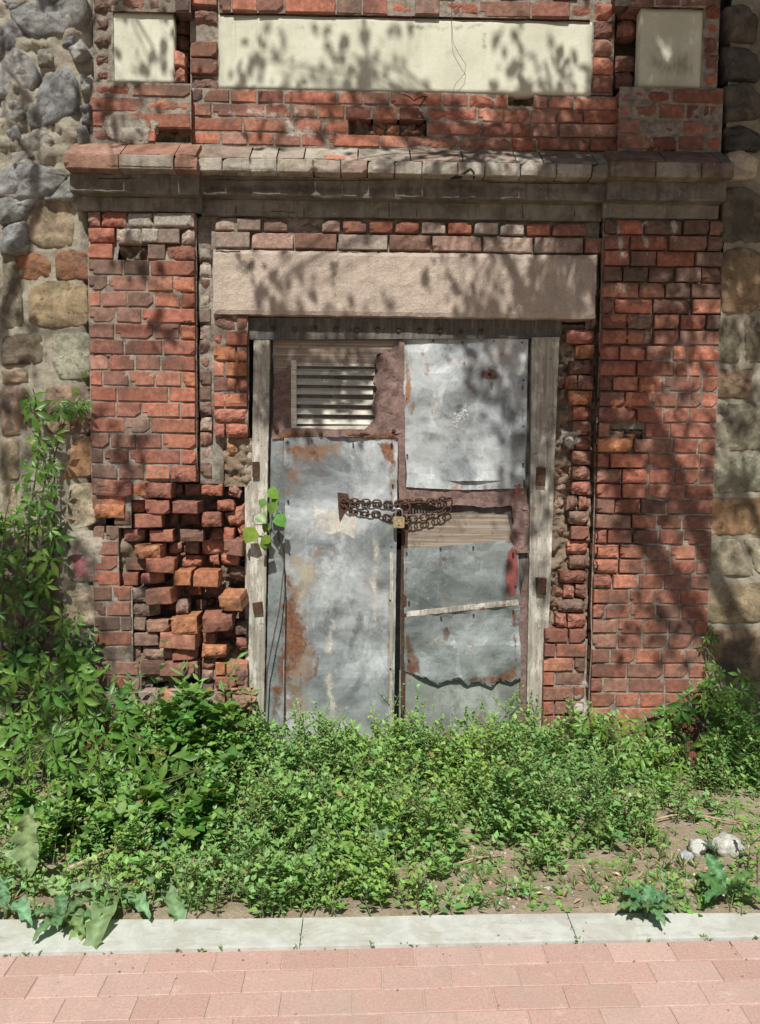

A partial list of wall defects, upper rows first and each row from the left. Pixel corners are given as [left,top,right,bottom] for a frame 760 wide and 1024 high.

spalling [348,120,426,137]
spalling [610,314,643,344]
corrosion [405,364,414,413]
corrosion [278,432,337,459]
corrosion [346,432,396,501]
spalling [548,325,655,636]
corrosion [271,575,319,713]
corrosion [407,636,419,675]